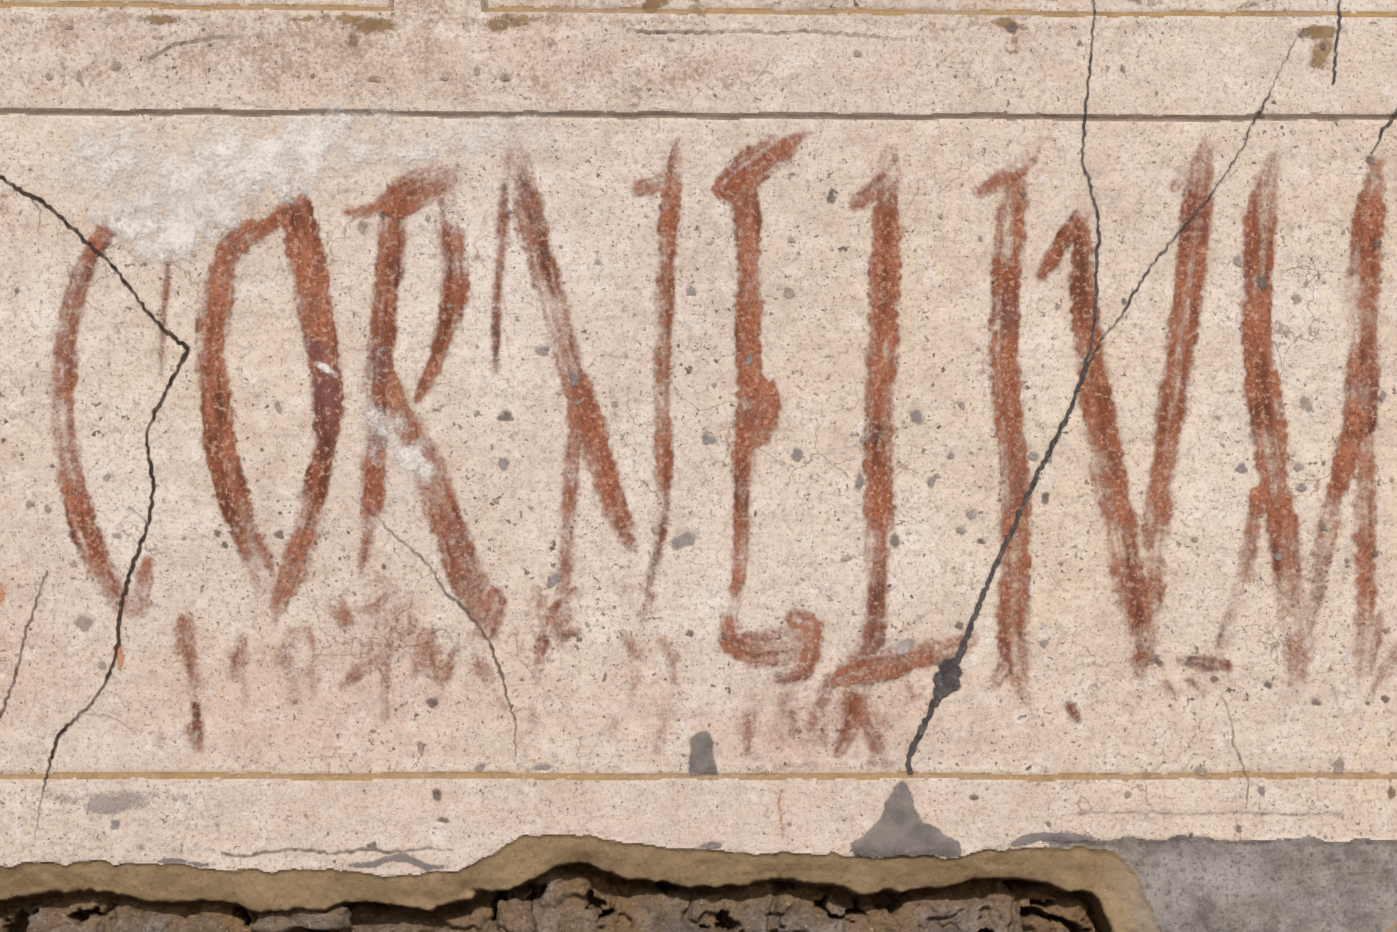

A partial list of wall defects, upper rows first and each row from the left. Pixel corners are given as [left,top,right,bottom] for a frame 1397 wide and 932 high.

crack [1332,0,1342,84]
crack [1371,108,1397,154]
crack [906,0,1271,774]
crack [0,175,190,789]
spalling [0,834,1160,932]